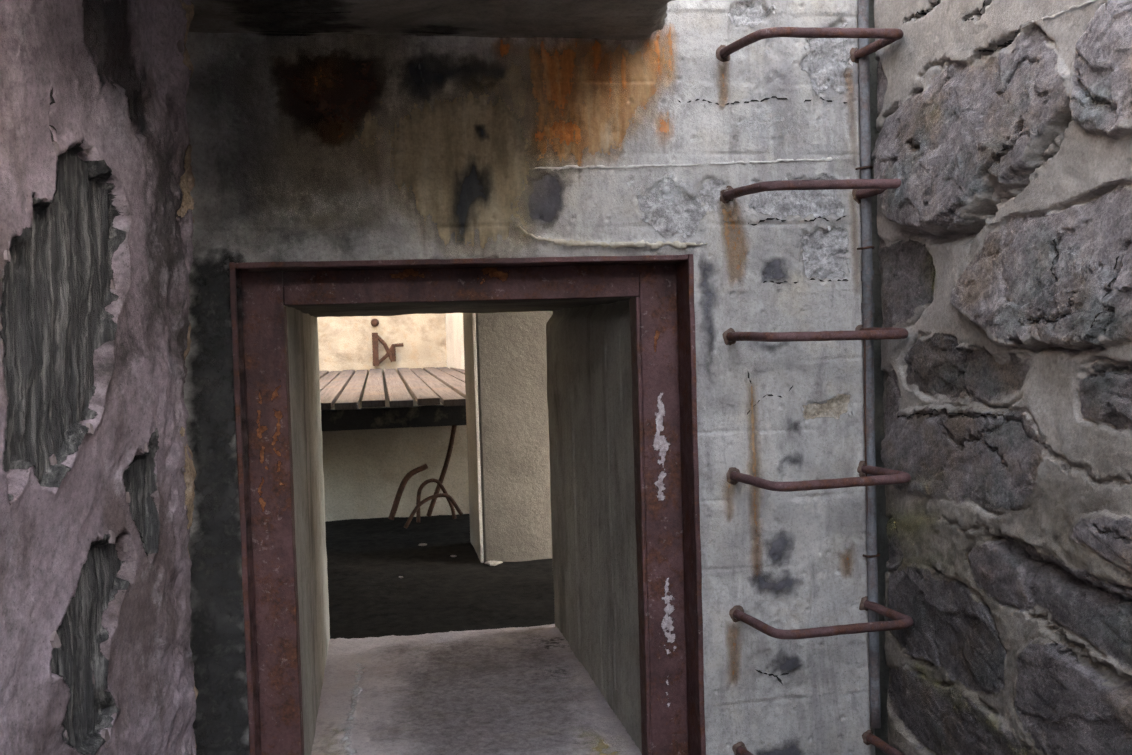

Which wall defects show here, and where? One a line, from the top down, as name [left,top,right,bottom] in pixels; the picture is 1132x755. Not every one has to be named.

leakage [272,54,707,250]
rust [528,27,673,169]
flaking render [0,141,126,488]
leakage [699,260,716,355]
spalling [180,427,197,529]
peeling [652,393,670,501]
flaking render [49,429,160,755]
peeling [661,578,677,655]
leakage [757,741,802,755]